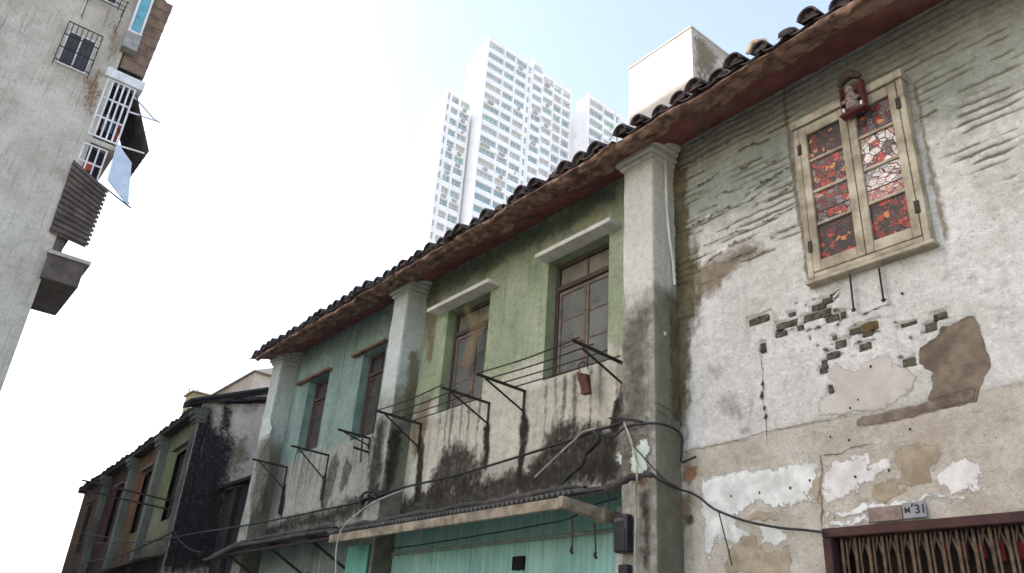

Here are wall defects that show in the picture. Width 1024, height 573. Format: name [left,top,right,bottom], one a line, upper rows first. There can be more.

damp [163,401,270,573]
damp [265,290,654,567]
peeling [615,438,650,473]
crack [683,339,850,453]
peeling [700,443,983,573]
spalling [749,296,990,416]